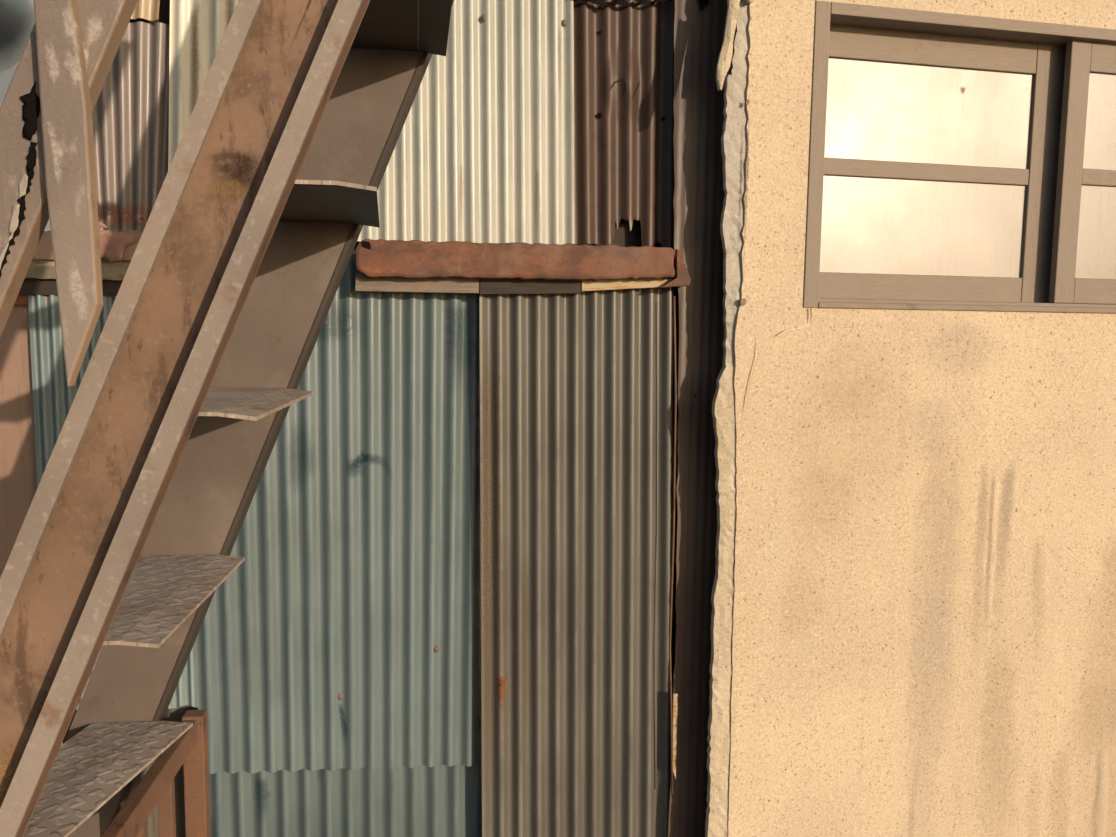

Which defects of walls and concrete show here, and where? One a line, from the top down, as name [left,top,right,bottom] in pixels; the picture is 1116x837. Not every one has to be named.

crack [0,142,38,278]
spalling [705,0,754,837]